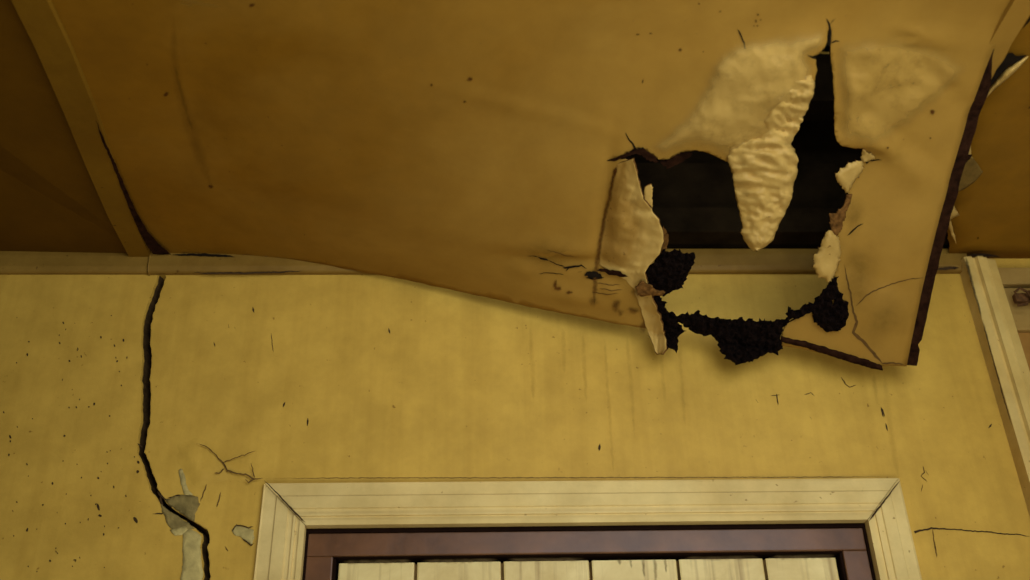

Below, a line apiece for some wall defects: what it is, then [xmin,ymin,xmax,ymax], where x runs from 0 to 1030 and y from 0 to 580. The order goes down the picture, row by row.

peeling [599,158,667,355]
crack [137,276,304,580]
peeling [161,469,204,580]
peeling [232,525,254,546]
crack [914,527,1029,556]